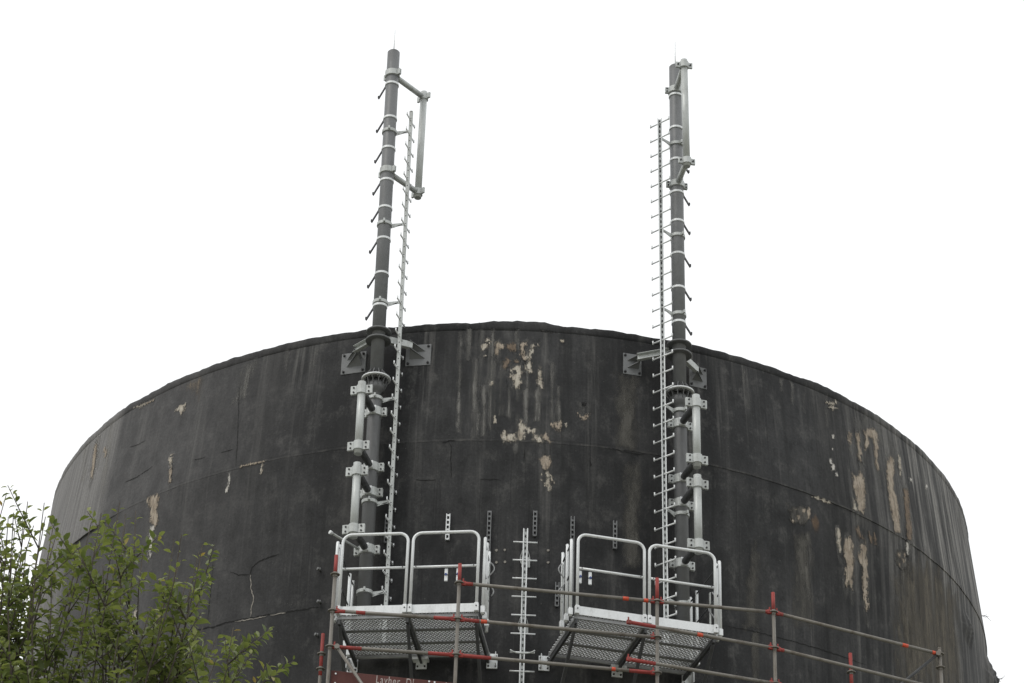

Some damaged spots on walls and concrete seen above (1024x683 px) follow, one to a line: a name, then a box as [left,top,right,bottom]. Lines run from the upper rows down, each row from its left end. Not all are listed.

peeling [481,328,564,396]
peeling [493,416,567,448]
spalling [540,455,555,491]
spalling [146,493,160,557]
peeling [829,427,928,612]